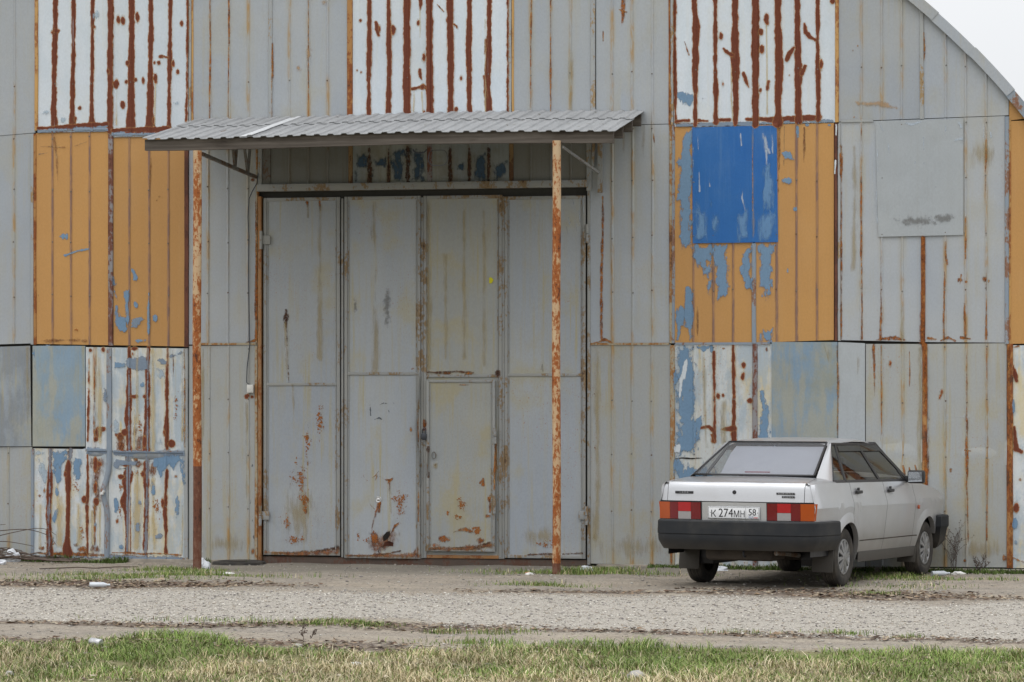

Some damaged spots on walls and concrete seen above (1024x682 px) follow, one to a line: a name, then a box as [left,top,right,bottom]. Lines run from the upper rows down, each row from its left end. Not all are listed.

rust [36,0,189,173]
rust [356,0,492,115]
rust [669,0,835,169]
peeling [676,119,837,300]
peeling [36,351,185,559]
peeling [113,268,157,343]
rust [251,471,492,557]
peeling [673,286,716,478]
peeling [758,390,771,438]
rust [860,167,971,485]
rust [1003,466,1022,567]
rust [1007,344,1023,454]